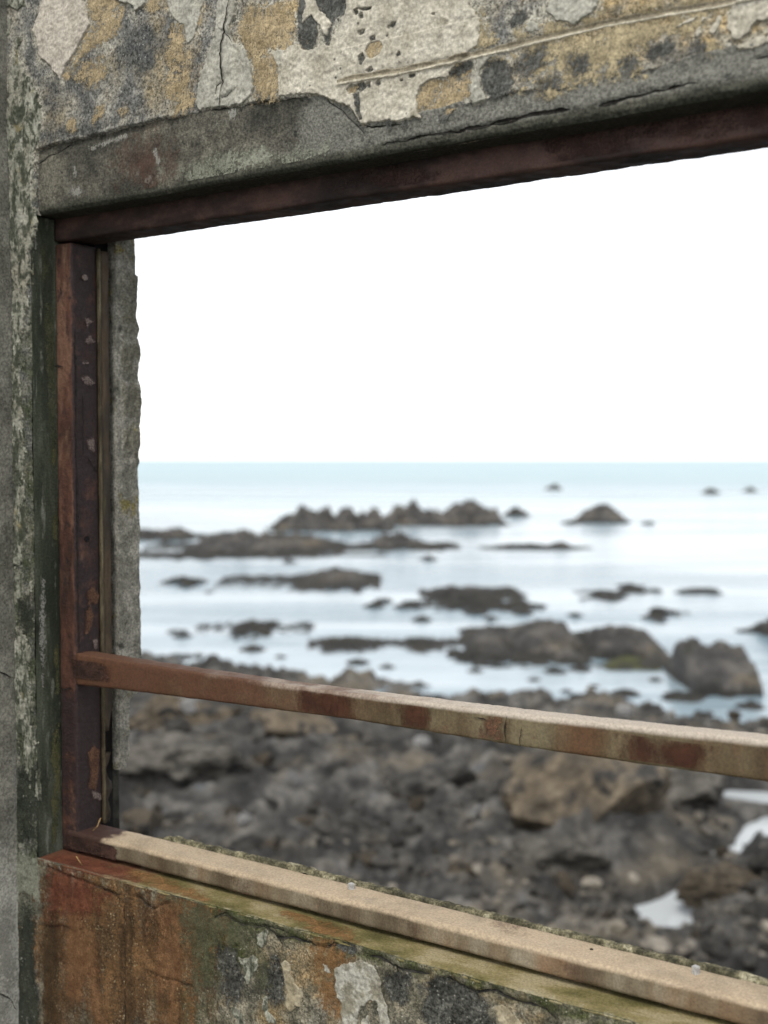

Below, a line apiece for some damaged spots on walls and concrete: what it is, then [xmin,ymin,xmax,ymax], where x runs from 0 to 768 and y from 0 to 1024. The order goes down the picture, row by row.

peeling [32,0,90,80]
crack [213,0,232,110]
peeling [195,0,254,111]
peeling [272,0,599,129]
peeling [618,0,768,75]
damp [17,579,59,695]
rust [298,690,349,718]
rust [402,705,430,729]
rust [627,735,705,768]
damp [0,755,42,1024]
rust [18,834,230,1024]
peeling [323,941,412,1024]